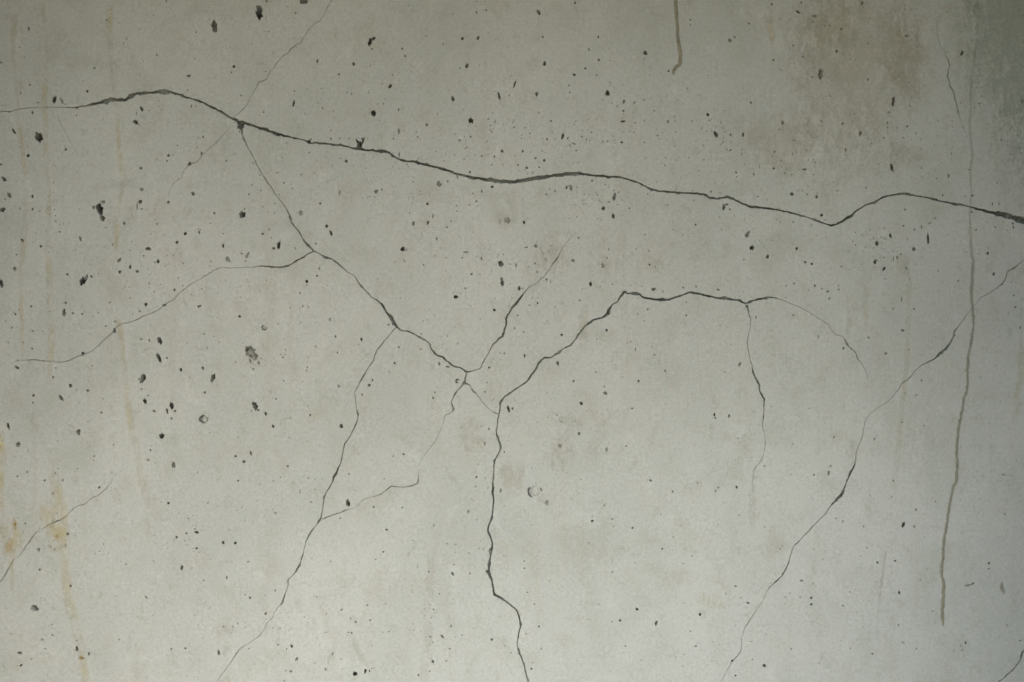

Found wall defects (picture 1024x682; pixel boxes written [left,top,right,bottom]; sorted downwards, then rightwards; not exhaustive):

crack [254,0,332,91]
crack [58,89,1024,227]
crack [9,267,230,363]
crack [0,476,115,582]
crack [236,199,826,682]
crack [721,260,1024,682]